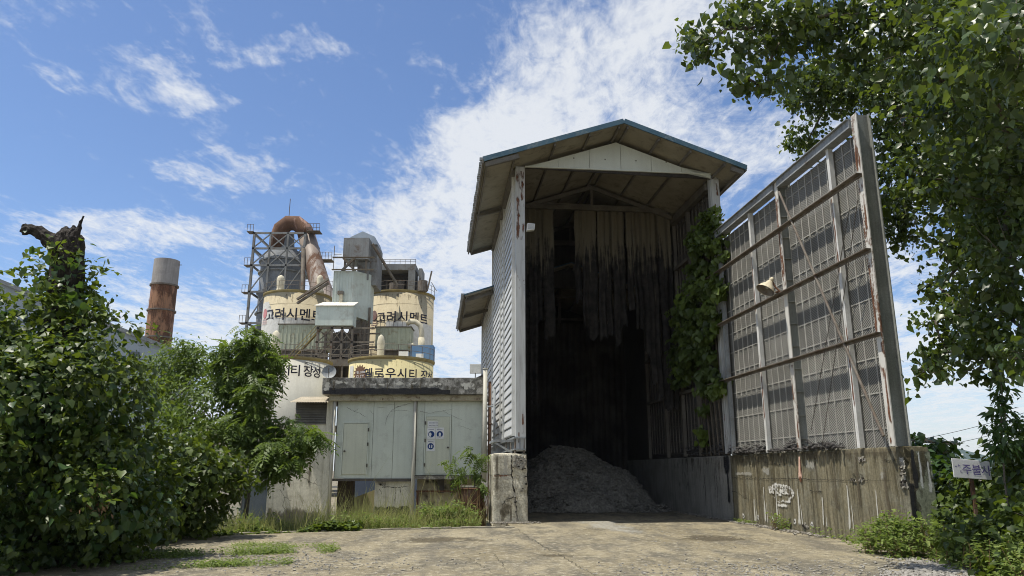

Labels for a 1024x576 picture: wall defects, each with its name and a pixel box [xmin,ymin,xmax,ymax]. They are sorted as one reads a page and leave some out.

rust [516,171,524,239]
rust [146,285,174,341]
crack [489,455,592,574]
damp [677,448,895,531]
damp [909,450,920,534]